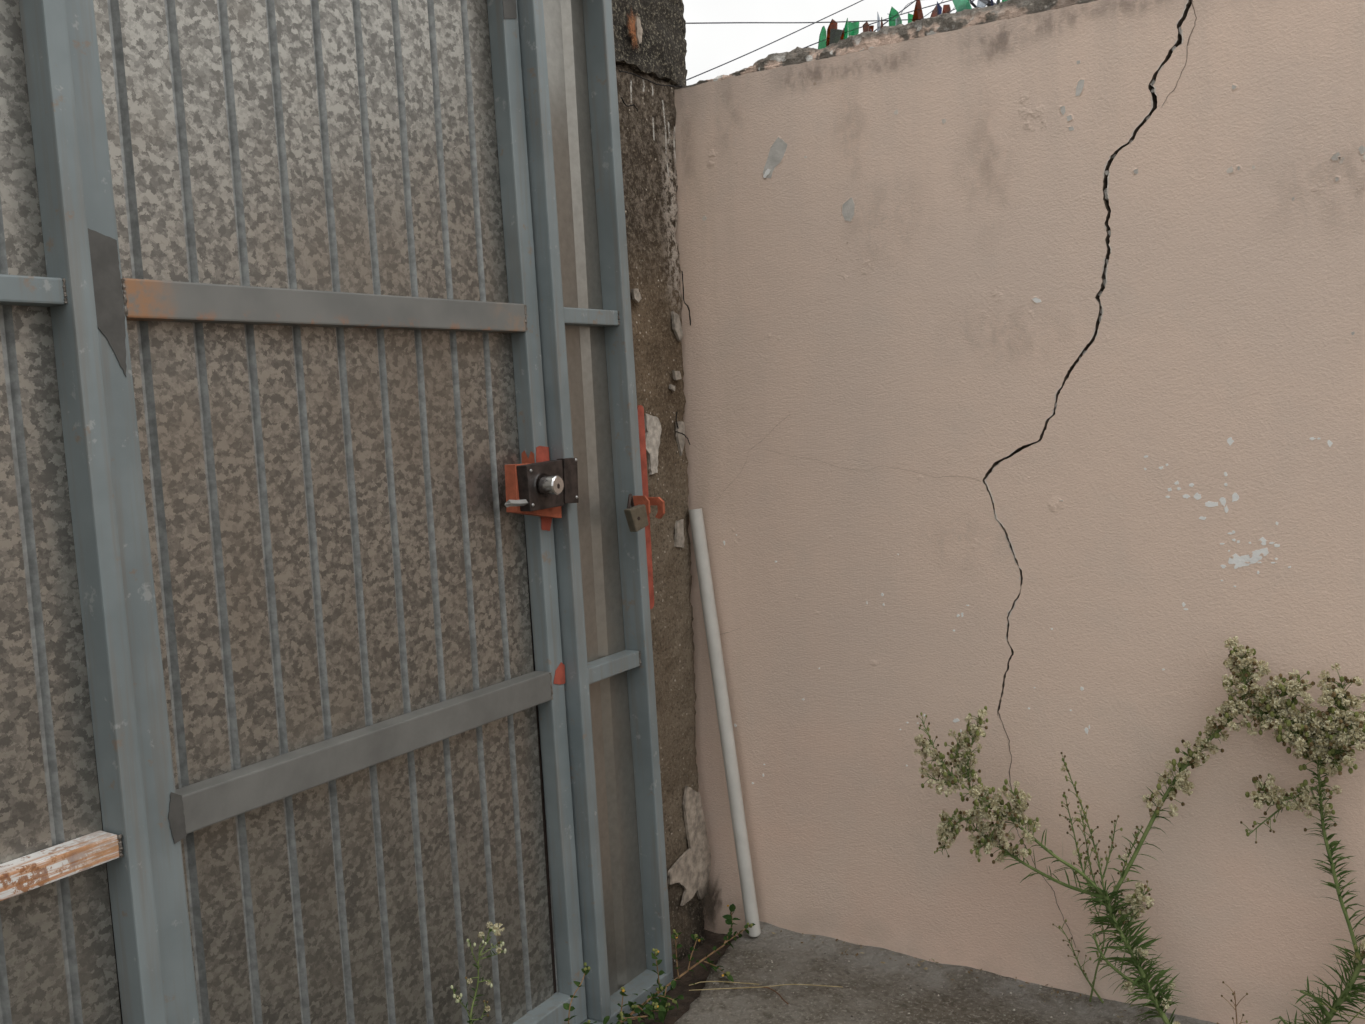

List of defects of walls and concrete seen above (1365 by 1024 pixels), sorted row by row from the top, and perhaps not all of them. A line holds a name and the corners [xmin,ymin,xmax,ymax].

crack [766,0,1197,947]
peeling [1165,472,1239,520]
peeling [1212,530,1291,587]
peeling [667,786,711,906]